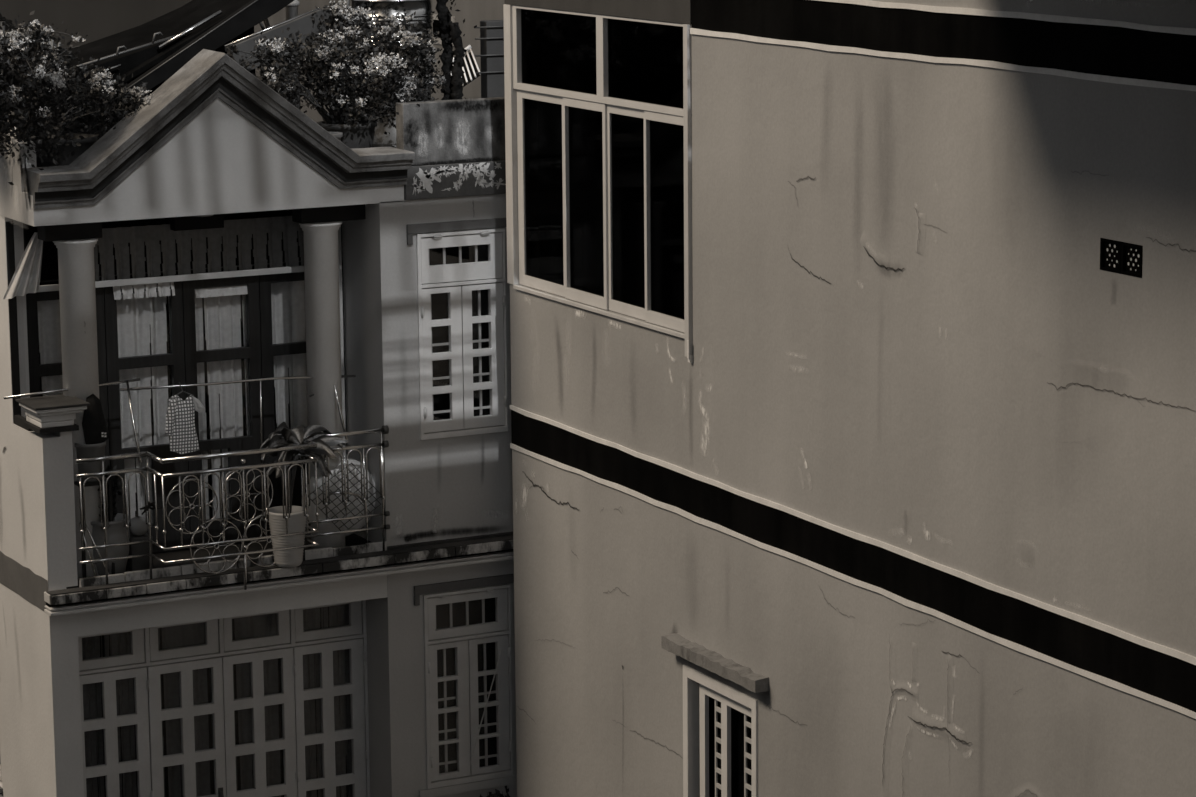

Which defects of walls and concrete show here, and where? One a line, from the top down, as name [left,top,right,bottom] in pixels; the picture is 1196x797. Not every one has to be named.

water stain [406,114,429,148]
water stain [445,99,501,129]
crack [1051,383,1193,411]
crack [522,471,578,510]